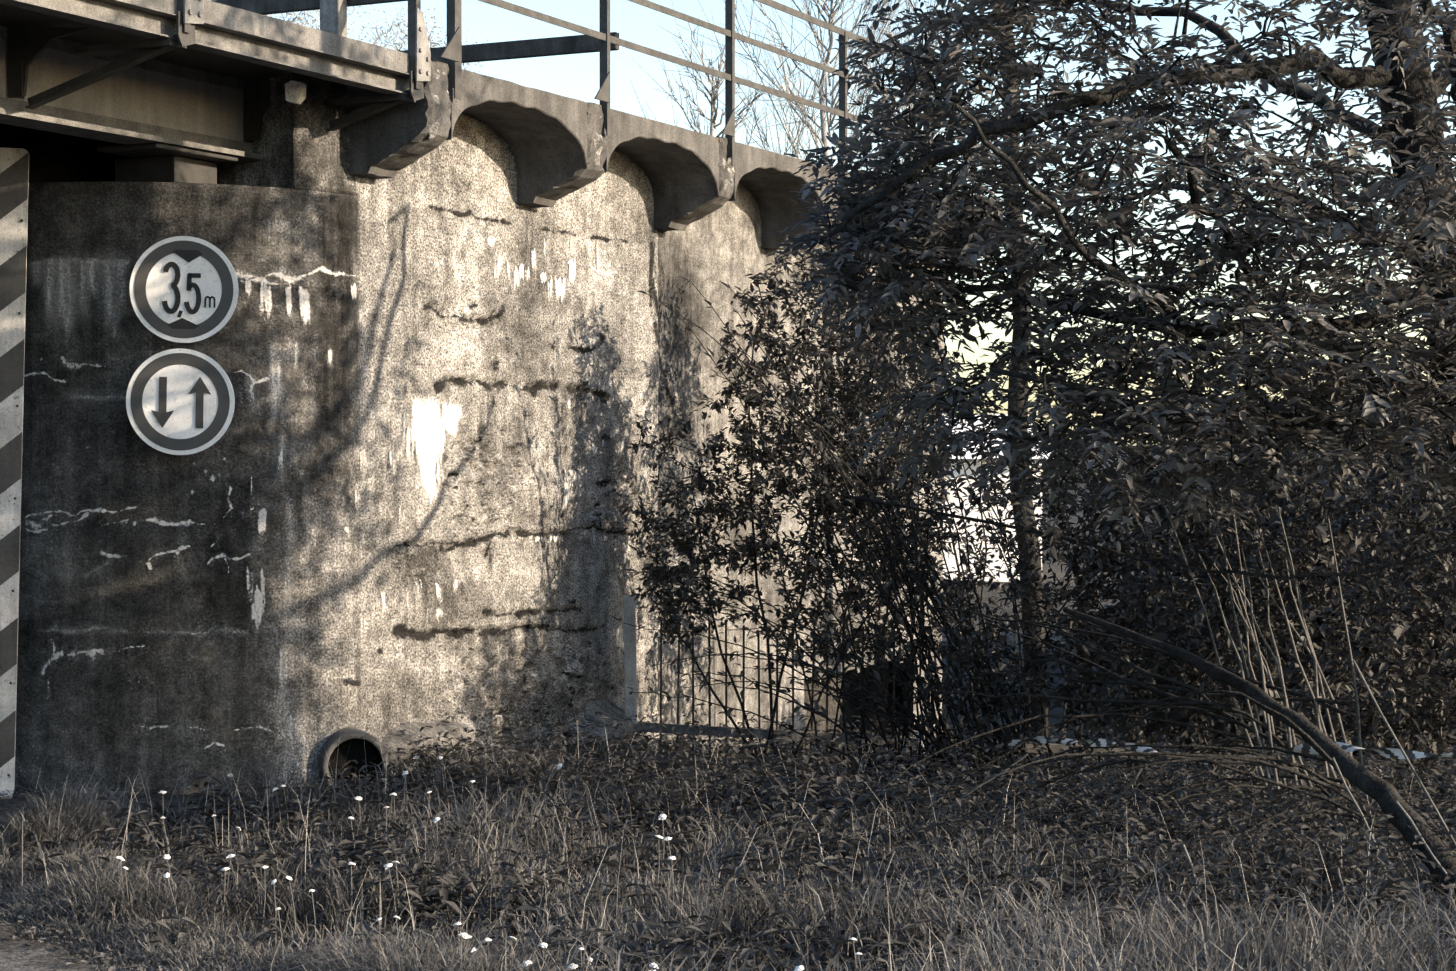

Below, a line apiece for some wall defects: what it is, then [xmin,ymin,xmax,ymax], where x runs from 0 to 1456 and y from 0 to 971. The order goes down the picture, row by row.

peeling [403,385,525,544]
efflorescence [250,477,267,534]
efflorescence [246,567,265,628]